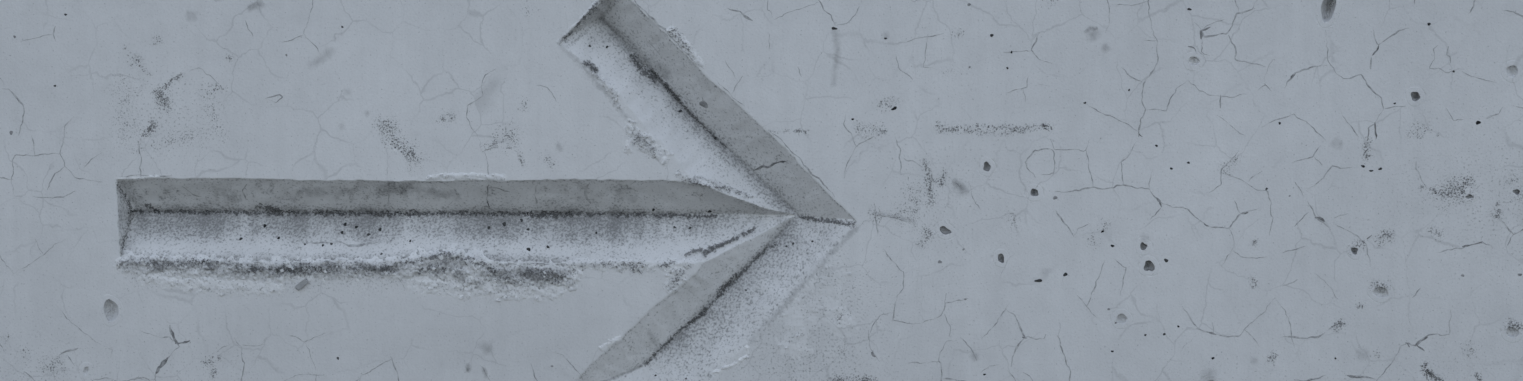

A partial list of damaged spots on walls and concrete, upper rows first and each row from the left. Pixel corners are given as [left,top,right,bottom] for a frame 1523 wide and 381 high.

crack [728,0,860,77]
crack [896,0,944,80]
crack [1004,32,1050,99]
crack [0,78,202,198]
crack [304,148,407,288]
crack [466,69,538,208]
crack [1025,0,1523,349]
crack [60,309,399,381]
crack [862,214,1126,381]
crack [1299,310,1451,381]